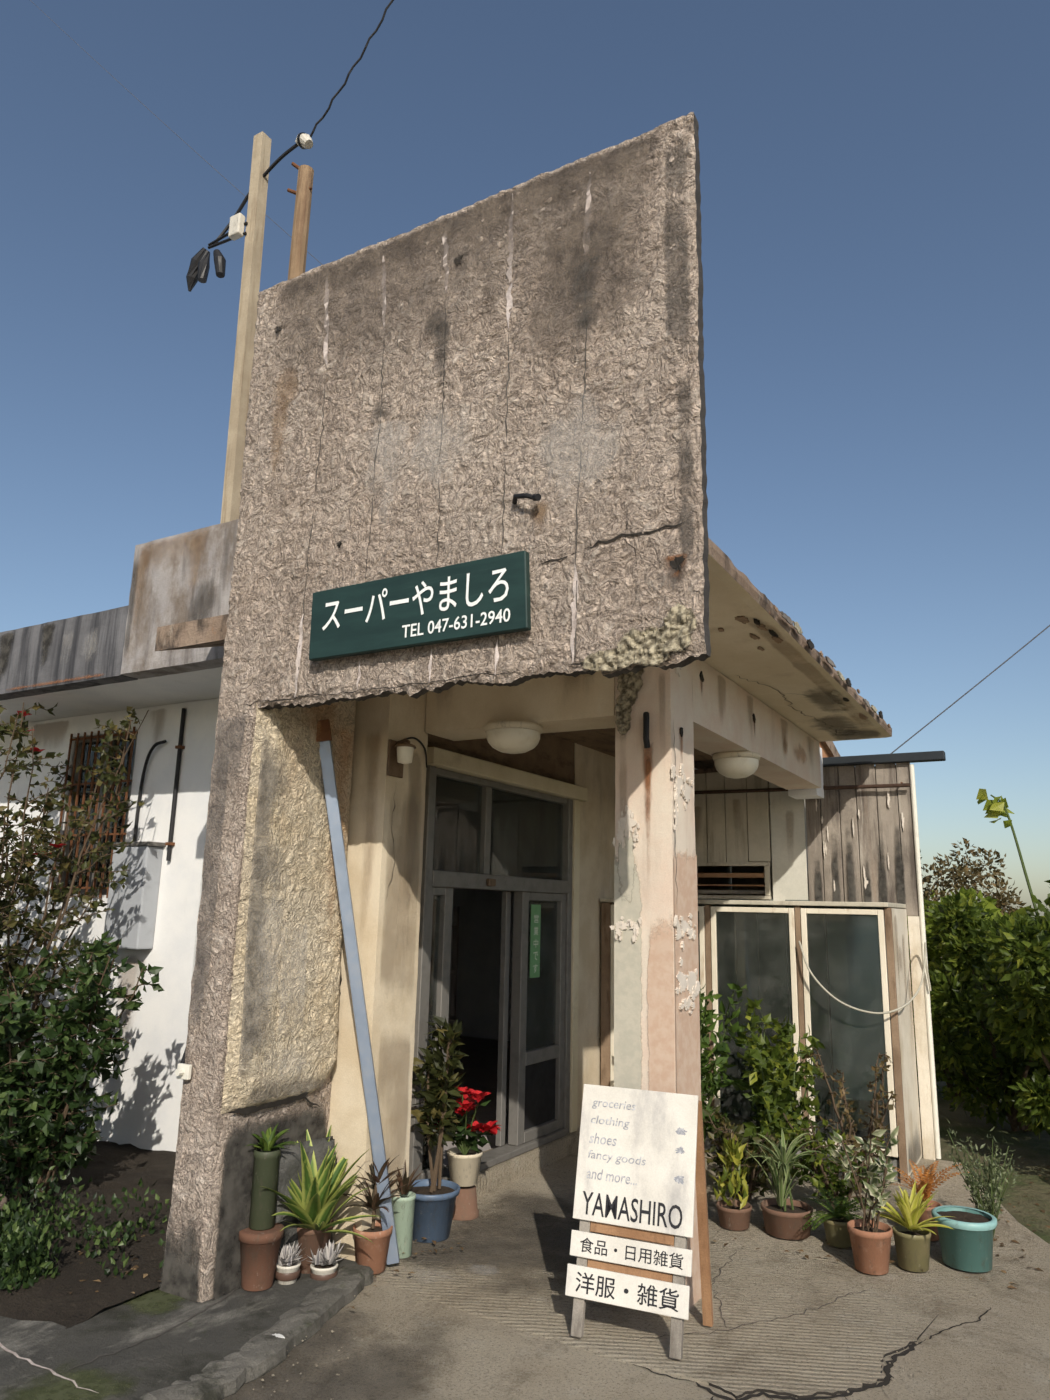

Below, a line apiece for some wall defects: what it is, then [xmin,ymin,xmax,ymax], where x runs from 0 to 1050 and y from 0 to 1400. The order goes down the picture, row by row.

crack [501,193,514,552]
crack [539,173,689,665]
spalling [583,603,697,735]
peeling [612,805,640,848]
peeling [671,763,694,830]
peeling [610,916,643,943]
peeling [673,913,700,1014]
crack [696,1341,923,1400]